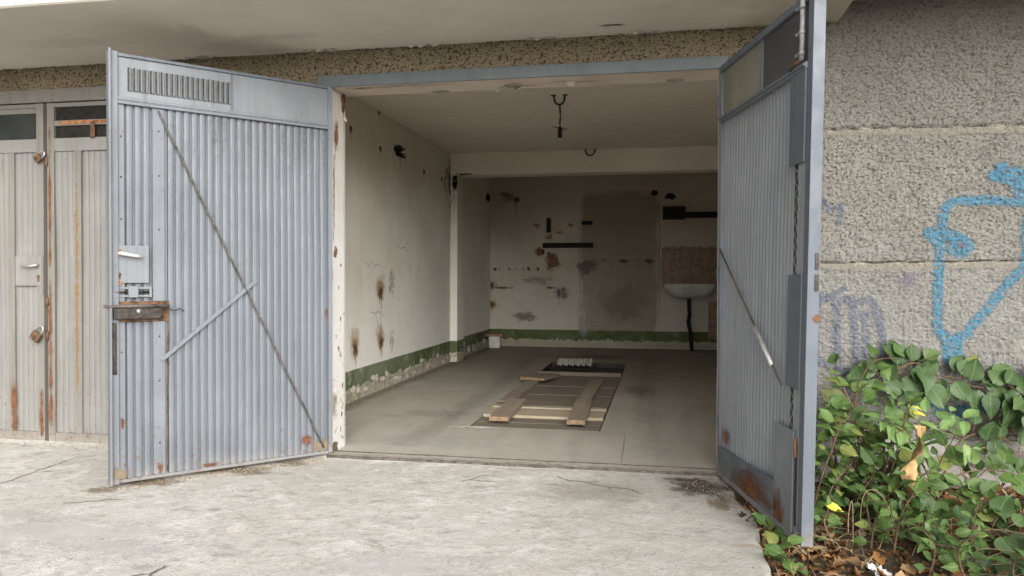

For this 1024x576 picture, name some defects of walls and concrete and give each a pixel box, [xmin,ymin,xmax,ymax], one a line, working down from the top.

corrosion [40,286,53,436]
peeling [332,337,489,452]
spalling [541,362,626,377]
corrosion [738,472,782,523]